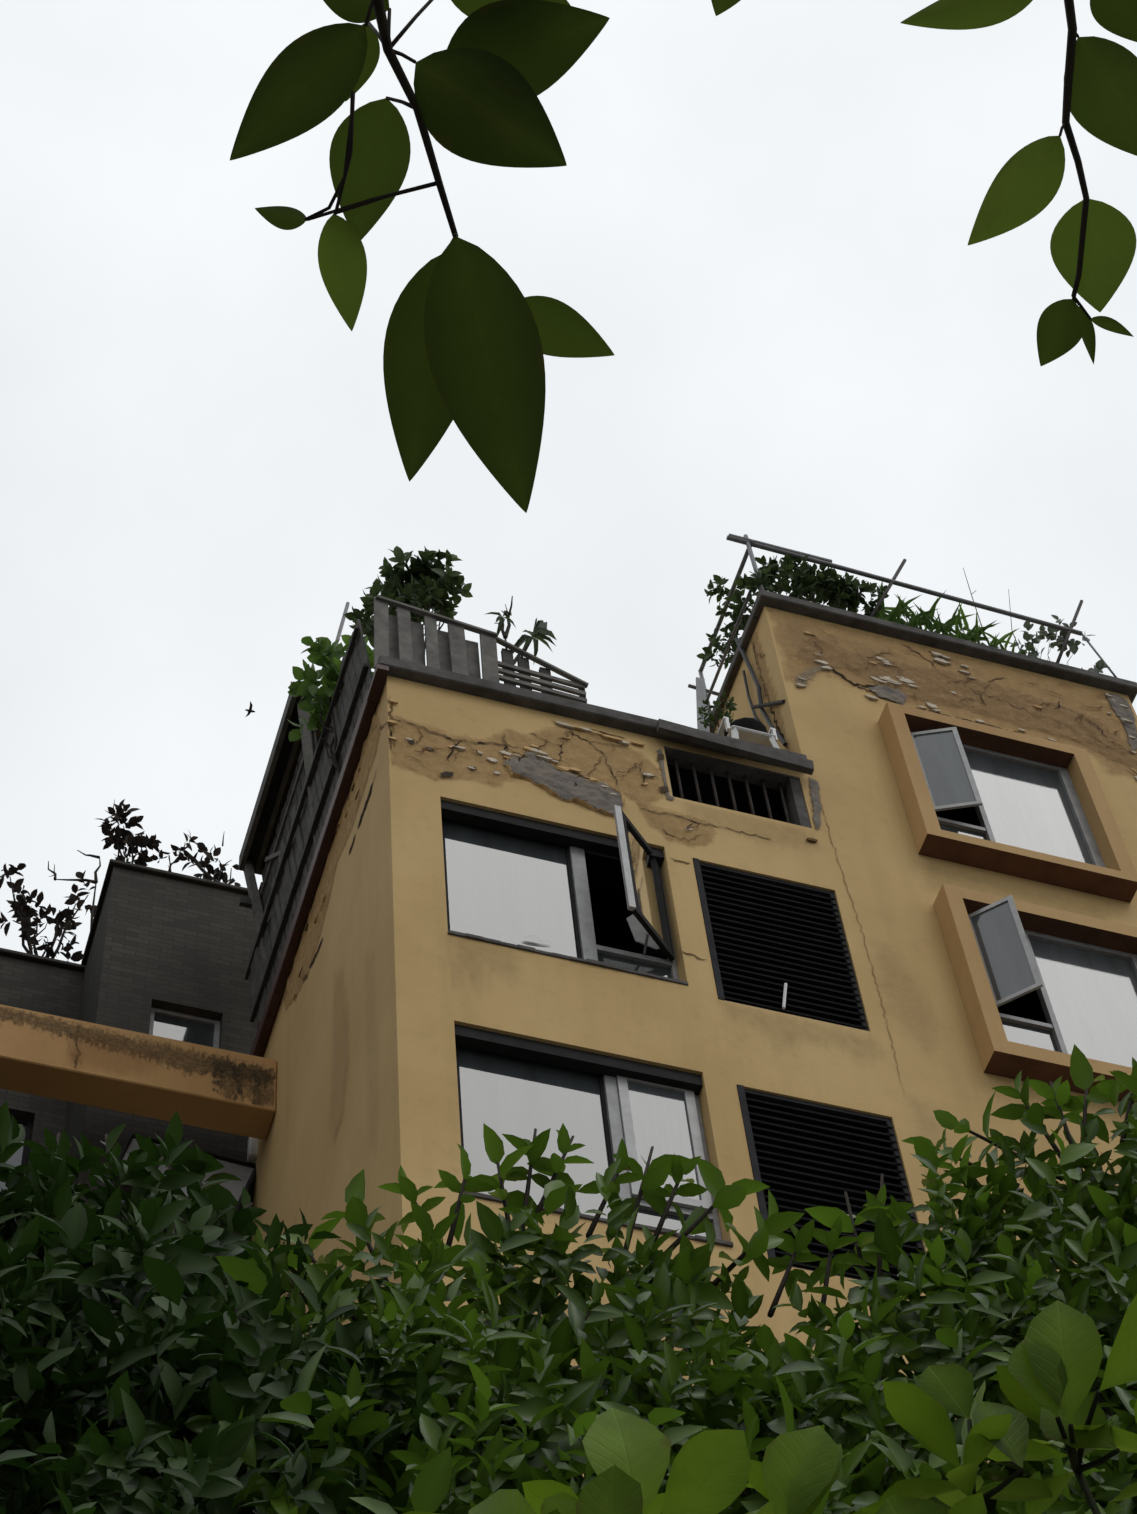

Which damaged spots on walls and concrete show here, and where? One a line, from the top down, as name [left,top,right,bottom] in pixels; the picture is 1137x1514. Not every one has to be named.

spalling [795,653,833,688]
spalling [864,675,919,705]
spalling [1105,693,1137,754]
crack [281,697,645,1010]
peeling [283,713,674,1008]